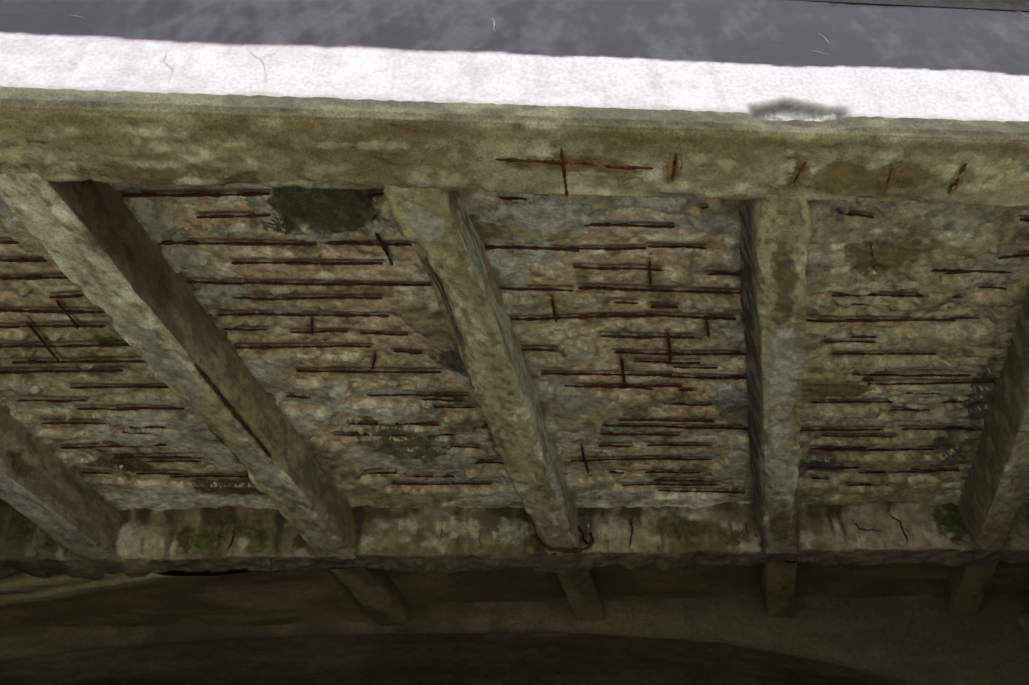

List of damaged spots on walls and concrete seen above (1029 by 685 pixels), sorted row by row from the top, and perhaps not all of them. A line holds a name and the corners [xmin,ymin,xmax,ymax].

spalling [470,189,543,210]
spalling [826,165,894,226]
spalling [0,216,250,487]
spalling [121,183,507,494]
spalling [481,198,749,498]
spalling [798,206,1029,492]
crack [851,514,908,544]